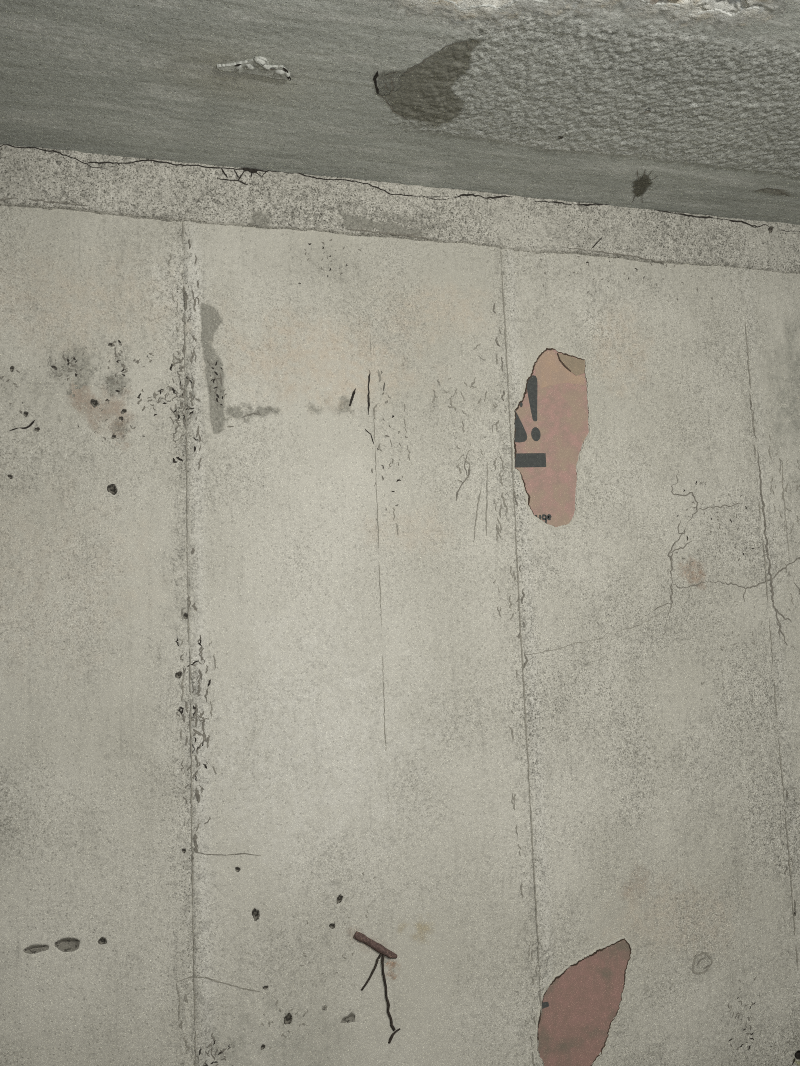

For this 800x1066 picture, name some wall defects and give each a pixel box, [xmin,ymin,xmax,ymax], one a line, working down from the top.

damp [373,39,482,126]
spalling [391,0,787,35]
damp [201,304,279,433]
peeling [512,346,592,530]
crack [527,395,800,655]
peeling [534,936,633,1066]